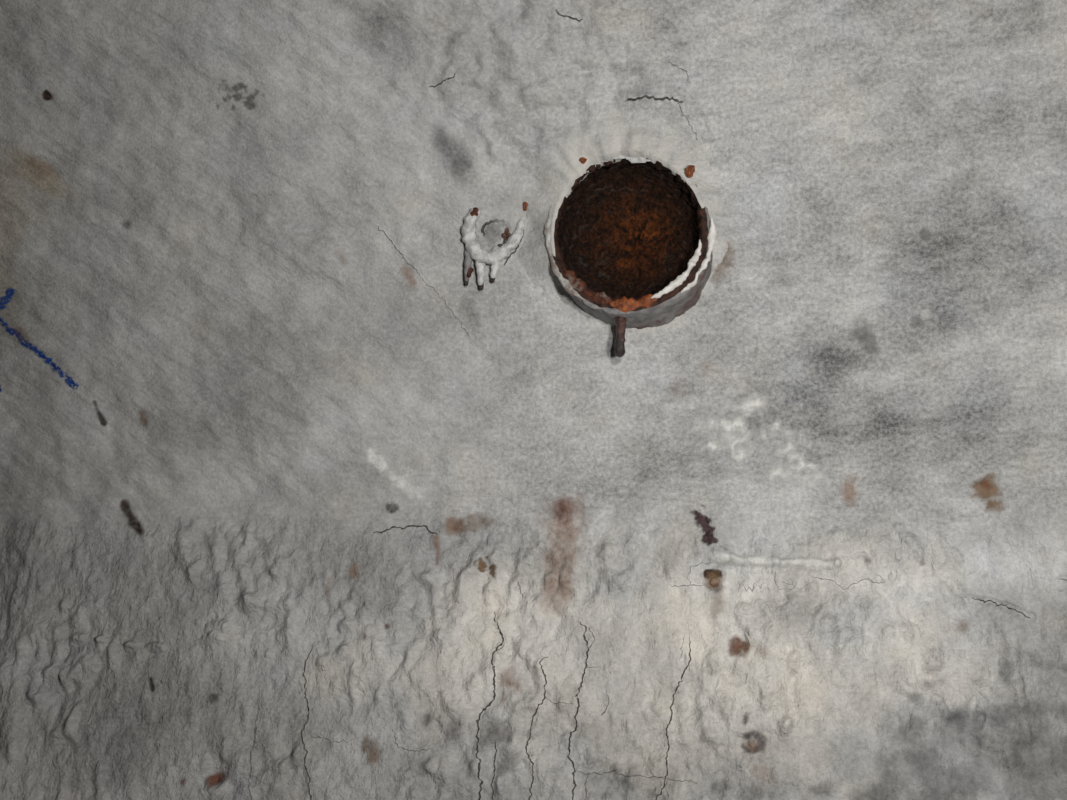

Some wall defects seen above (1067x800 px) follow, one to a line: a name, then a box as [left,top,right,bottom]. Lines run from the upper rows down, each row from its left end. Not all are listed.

crack [625,59,701,147]
corrosion [684,165,695,178]
corrosion [563,267,658,313]
corrosion [973,476,999,508]
crack [373,524,438,535]
corrosion [694,505,718,545]
crack [301,644,353,800]
crack [475,612,505,800]
crack [525,619,697,800]